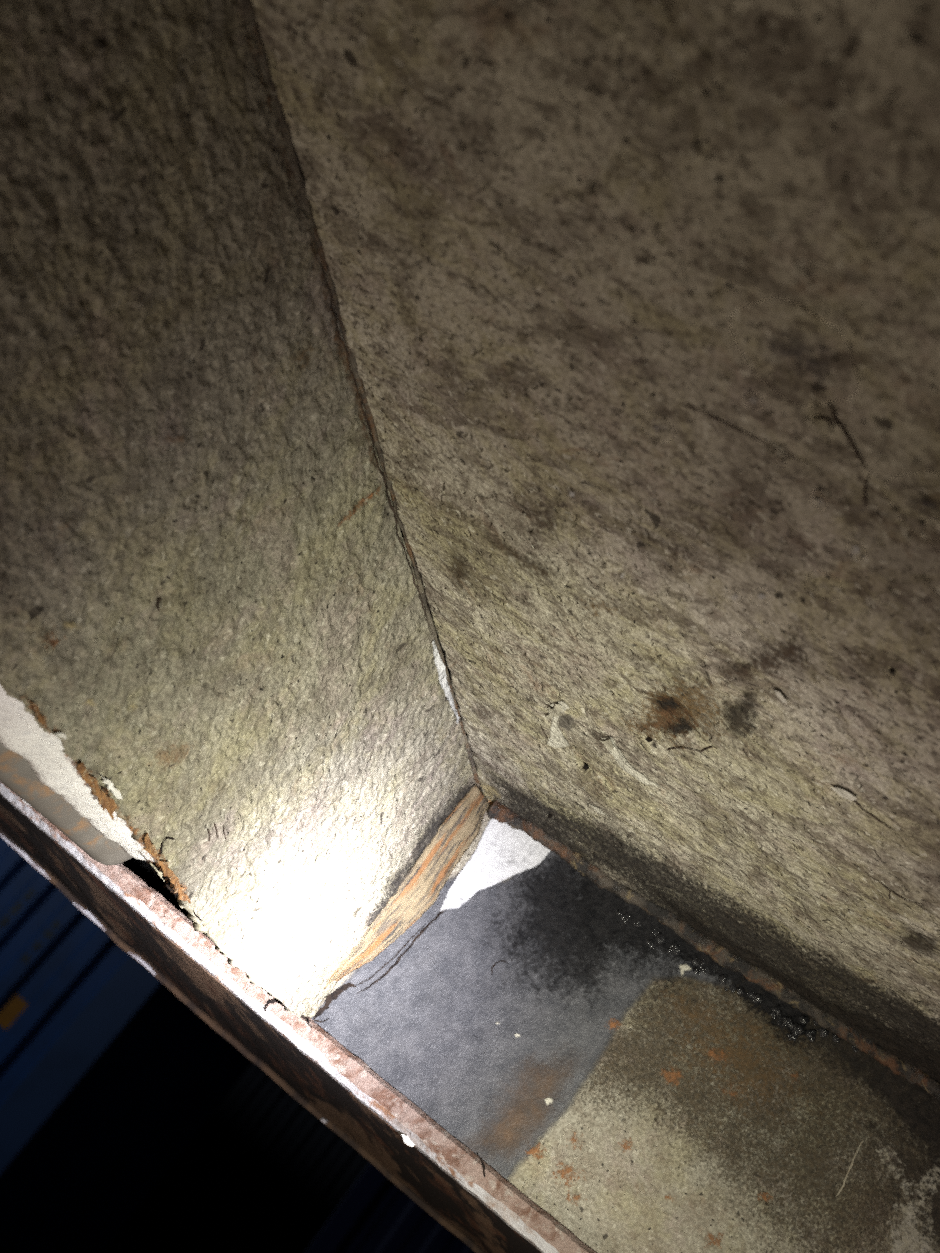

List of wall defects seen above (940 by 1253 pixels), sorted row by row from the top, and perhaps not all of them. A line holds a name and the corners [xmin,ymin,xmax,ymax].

spalling [0,685,191,904]
peeling [73,902,106,931]
damp [311,851,940,1253]
corrosion [553,1163,580,1201]